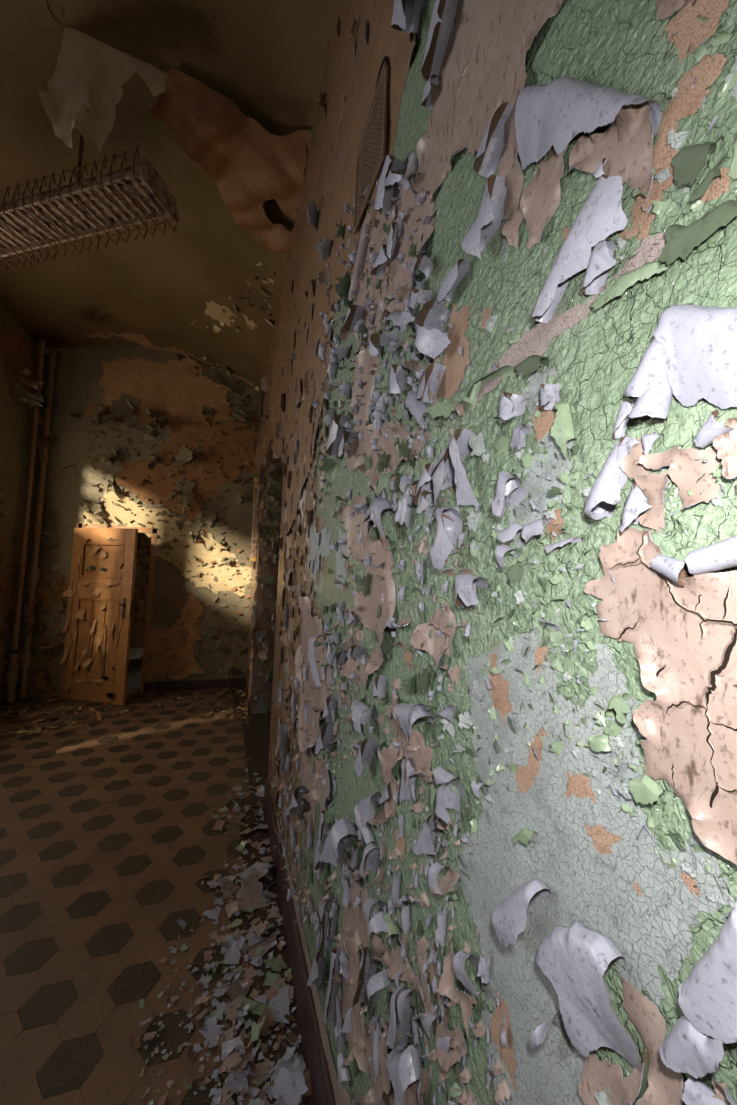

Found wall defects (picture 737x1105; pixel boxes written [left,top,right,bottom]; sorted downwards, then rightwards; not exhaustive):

peeling [717,56,737,101]
peeling [658,199,737,265]
flaking render [205,271,276,333]
peeling [589,261,668,314]
peeling [624,304,737,409]
flaking render [147,594,204,682]
peeling [392,600,471,702]
peeling [440,558,491,610]
peeling [494,588,562,633]
peeling [569,609,594,653]
crack [610,529,737,809]
peeling [438,701,457,737]